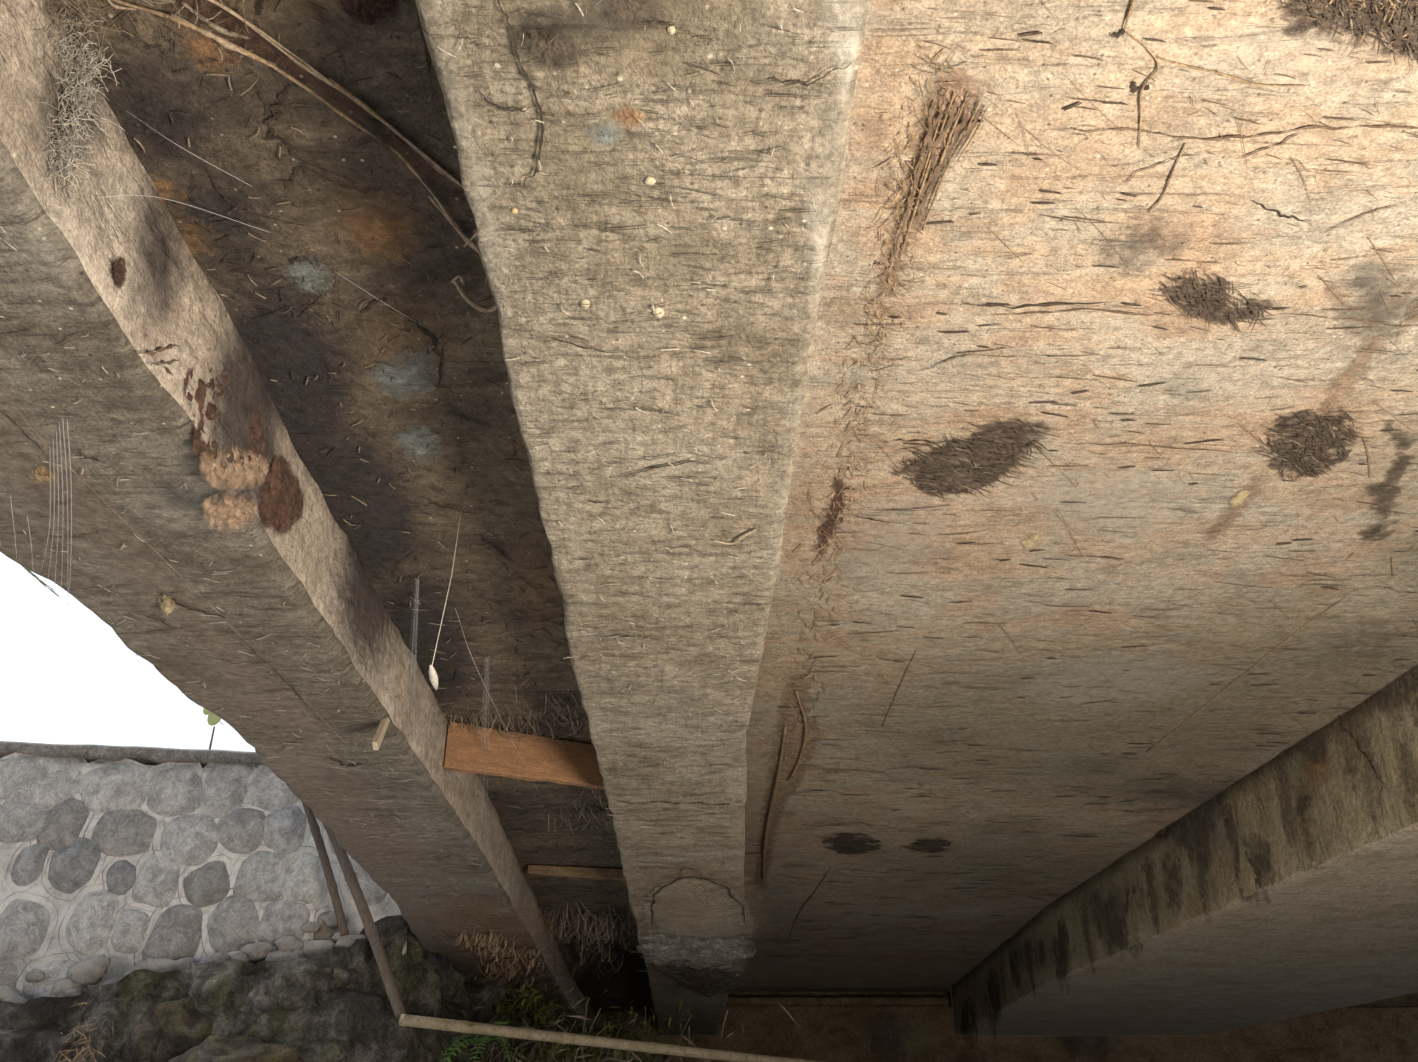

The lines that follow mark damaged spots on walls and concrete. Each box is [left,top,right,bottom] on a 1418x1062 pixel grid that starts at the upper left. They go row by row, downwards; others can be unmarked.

crack [477,0,544,186]
damp [1362,424,1412,542]
damp [1378,664,1418,710]
damp [960,797,1271,1045]